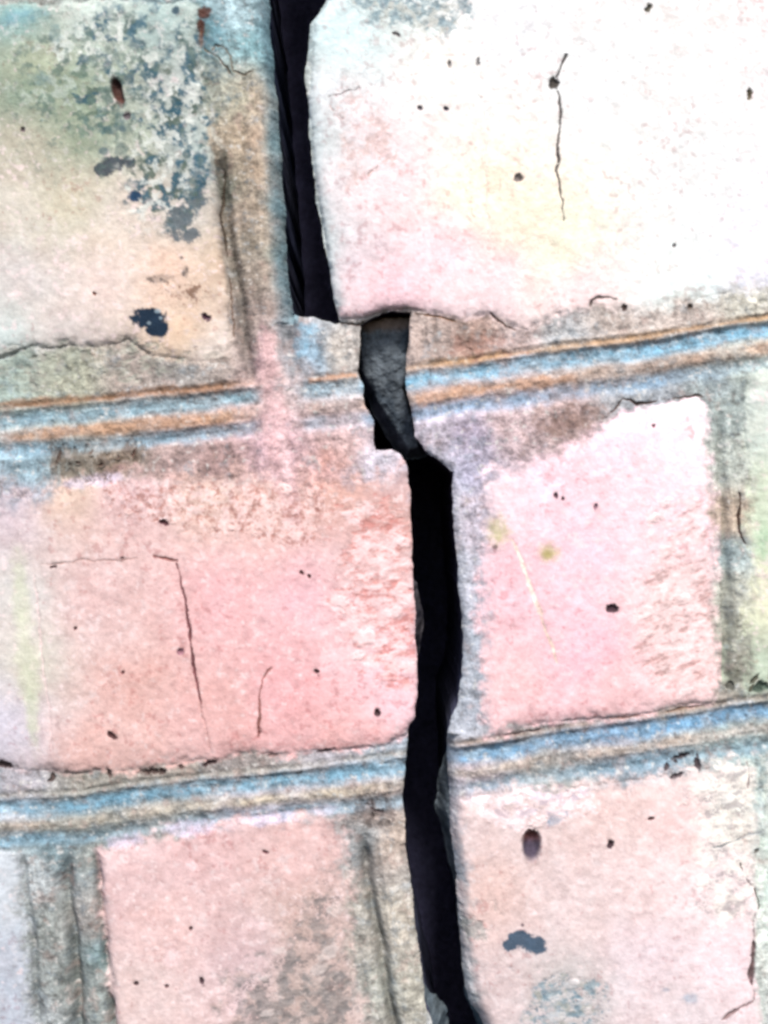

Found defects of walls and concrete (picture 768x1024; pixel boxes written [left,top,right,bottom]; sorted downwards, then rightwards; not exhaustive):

leakage [0,0,254,340]
crack [547,53,568,222]
crack [488,312,517,331]
crack [203,0,483,1024]
crack [0,554,220,783]